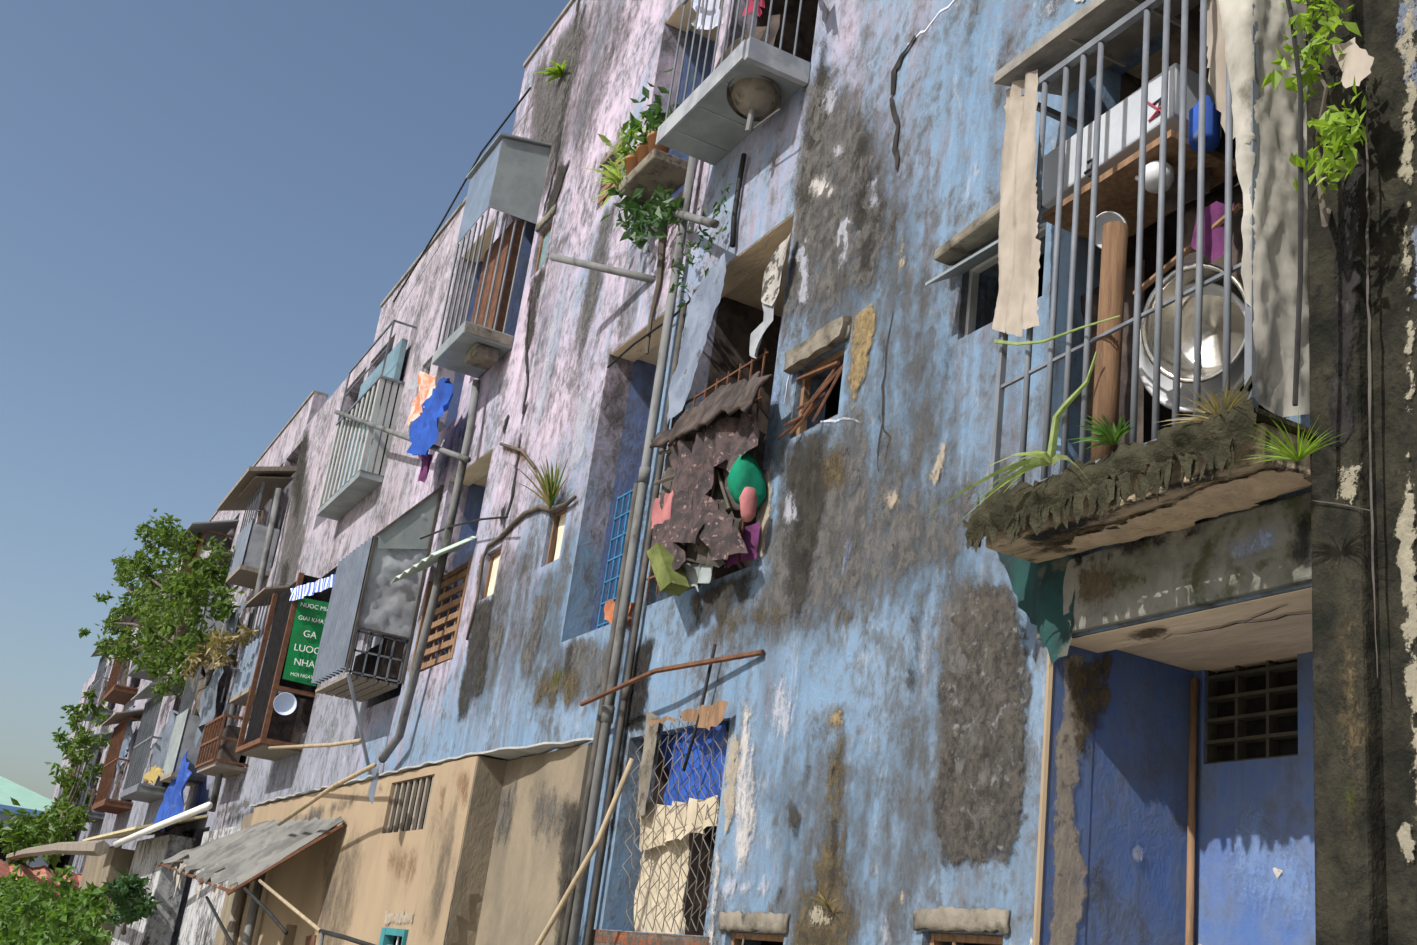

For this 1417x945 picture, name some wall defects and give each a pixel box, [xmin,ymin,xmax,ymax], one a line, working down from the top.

mould [797,41,830,219]
flaking render [782,69,905,409]
mould [850,128,883,284]
crack [889,214,897,244]
crack [889,0,954,170]
peeling [1396,0,1417,91]
crack [1163,604,1312,640]
damp [788,803,800,836]
damp [790,709,860,945]
flaking render [1050,651,1112,945]